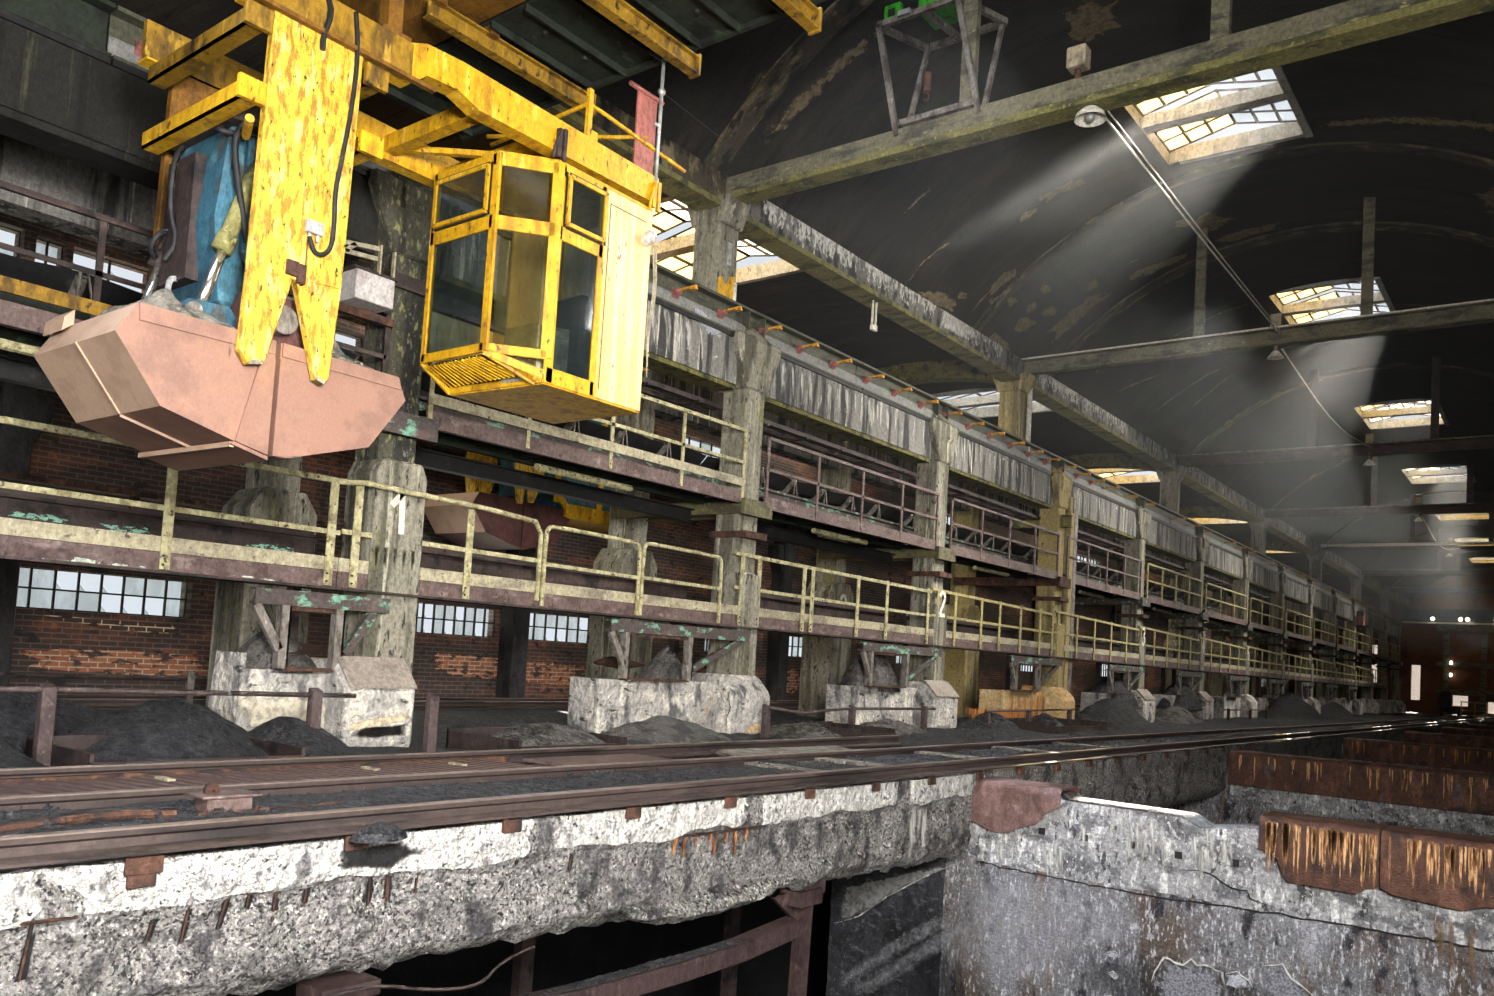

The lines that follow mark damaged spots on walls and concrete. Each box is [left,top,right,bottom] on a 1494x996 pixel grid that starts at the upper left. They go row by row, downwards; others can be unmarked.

rust [1239,755,1322,781]
rust [1350,741,1491,804]
spalling [341,843,423,906]
spalling [672,826,757,857]
rust [1265,821,1492,895]
spalling [144,919,158,941]
spalling [179,907,192,942]
spalling [215,893,253,930]
spalling [270,891,279,923]
spalling [14,915,78,983]